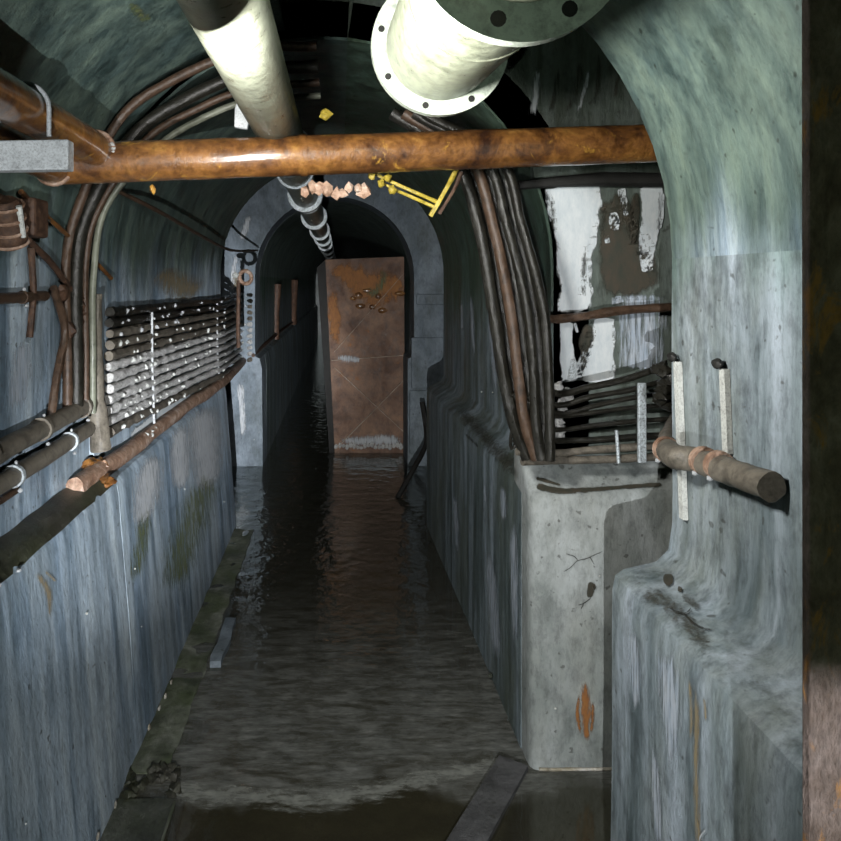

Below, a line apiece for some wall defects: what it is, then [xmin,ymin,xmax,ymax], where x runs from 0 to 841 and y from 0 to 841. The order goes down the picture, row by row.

peeling [546,187,610,312]
peeling [609,188,628,230]
peeling [639,187,664,272]
corrosion [328,293,341,342]
peeling [560,295,663,383]
corrosion [576,685,594,738]